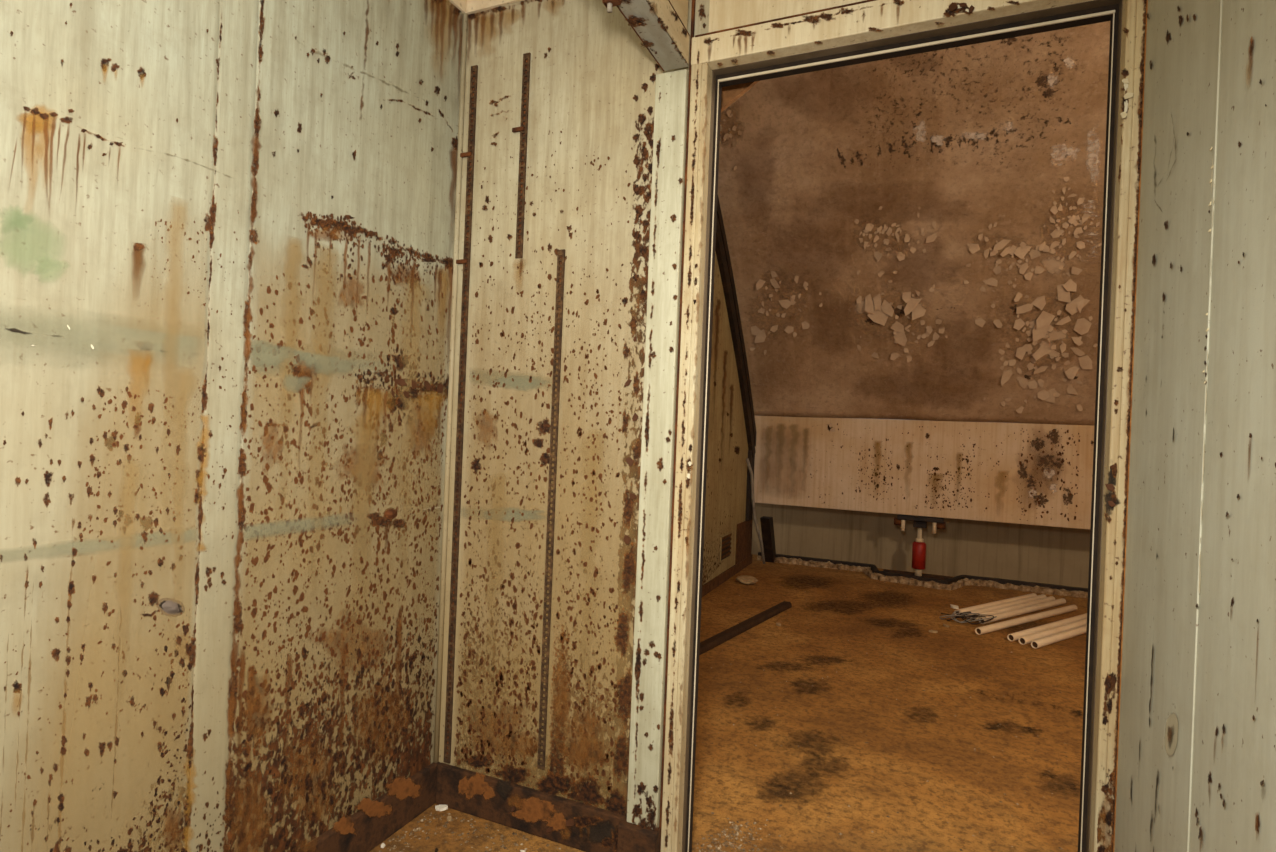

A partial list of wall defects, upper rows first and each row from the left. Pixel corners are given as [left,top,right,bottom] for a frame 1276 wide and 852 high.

rust [13,106,124,180]
rust [133,243,144,277]
rust [204,59,220,344]
rust [240,80,279,431]
rust [301,211,453,460]
rust [426,0,553,66]
rust [454,0,904,849]
peeling [856,284,947,363]
damp [869,35,1083,166]
peeling [964,144,1102,413]
spalling [1016,428,1080,521]
rust [3,364,441,852]